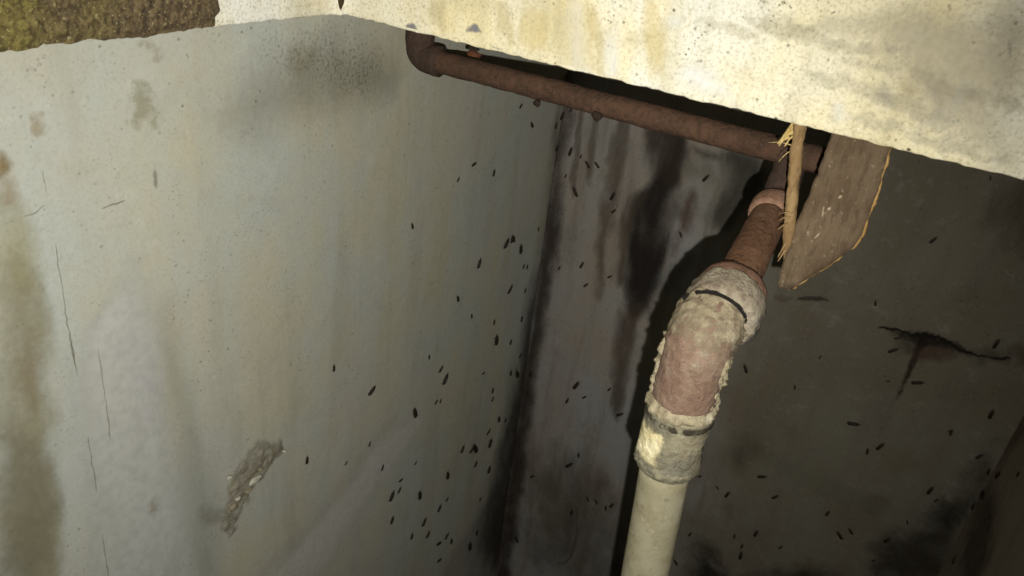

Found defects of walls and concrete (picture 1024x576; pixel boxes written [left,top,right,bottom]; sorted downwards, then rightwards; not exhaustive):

damp [485,178,560,576]
damp [613,130,684,411]
damp [634,287,748,485]
damp [716,152,760,226]
crack [879,326,1010,395]
spalling [223,443,287,537]